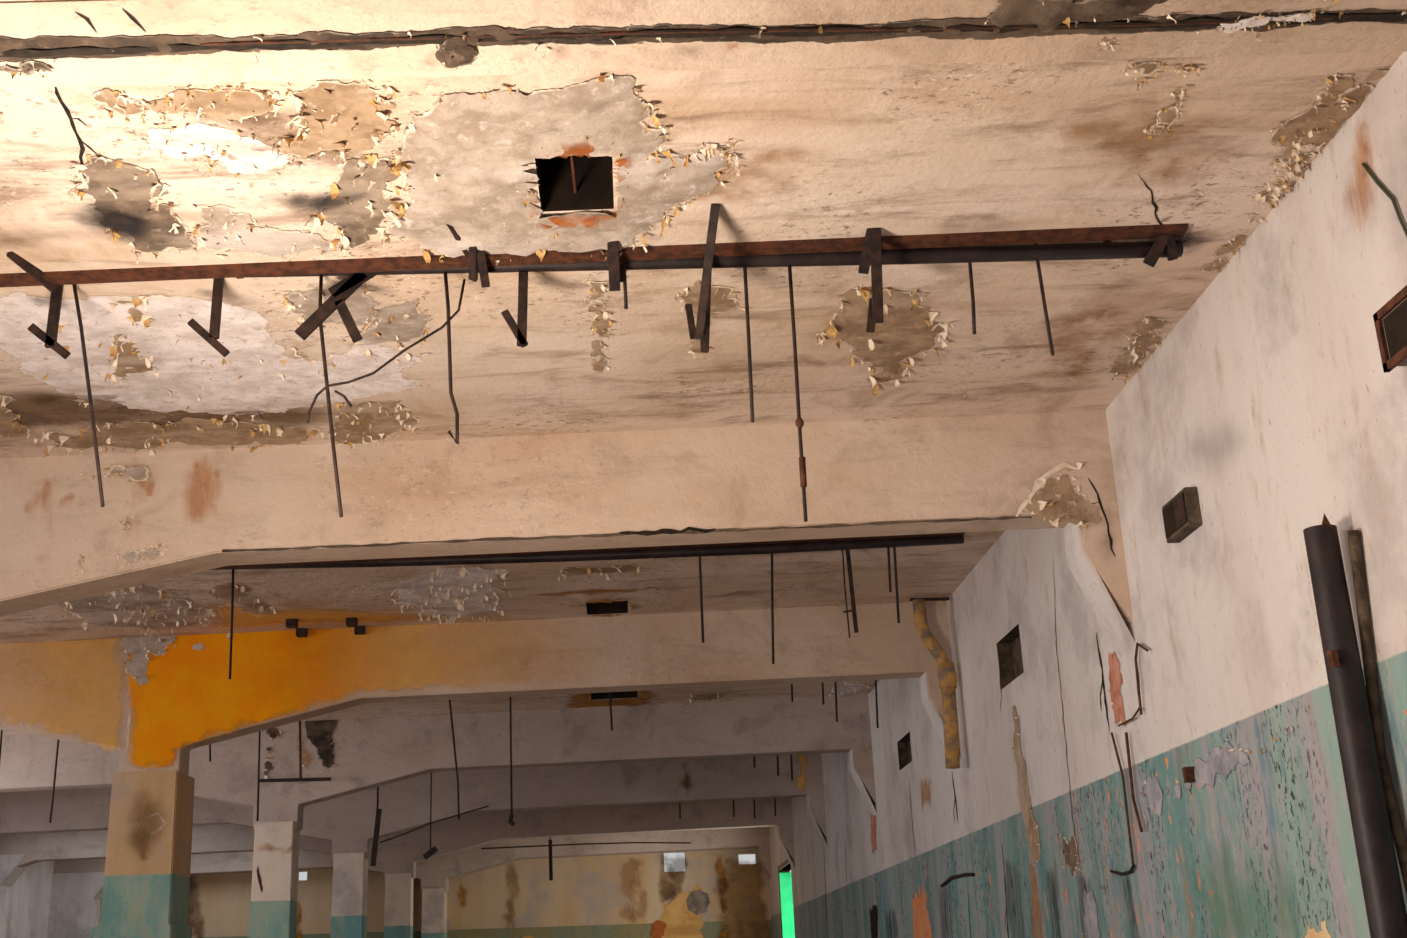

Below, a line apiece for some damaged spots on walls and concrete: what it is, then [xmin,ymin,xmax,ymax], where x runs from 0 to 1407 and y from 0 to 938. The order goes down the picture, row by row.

peeling [66,75,741,265]
peeling [1201,70,1389,275]
peeling [0,283,431,485]
peeling [816,285,956,396]
peeling [59,582,276,687]
leakage [33,608,446,768]
peeling [391,566,512,627]
leakage [135,805,156,858]
peeling [650,885,704,938]
leakage [715,858,769,938]